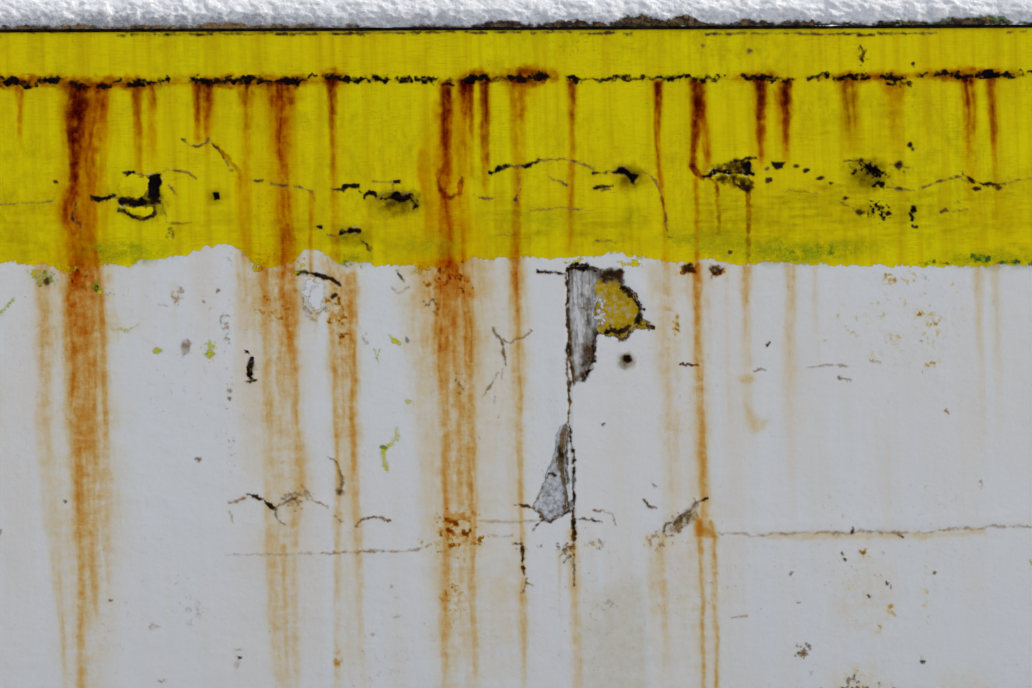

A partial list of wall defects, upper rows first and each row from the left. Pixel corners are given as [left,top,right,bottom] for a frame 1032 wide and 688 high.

corrosion [62,82,107,250]
corrosion [326,78,337,145]
corrosion [425,77,491,293]
corrosion [689,78,709,187]
corrosion [754,78,792,158]
corrosion [680,263,725,275]
peeling [565,262,655,383]
crack [228,458,427,554]
corrosion [440,517,484,547]
crack [514,504,545,591]
peeling [533,424,573,523]
crack [557,353,601,586]